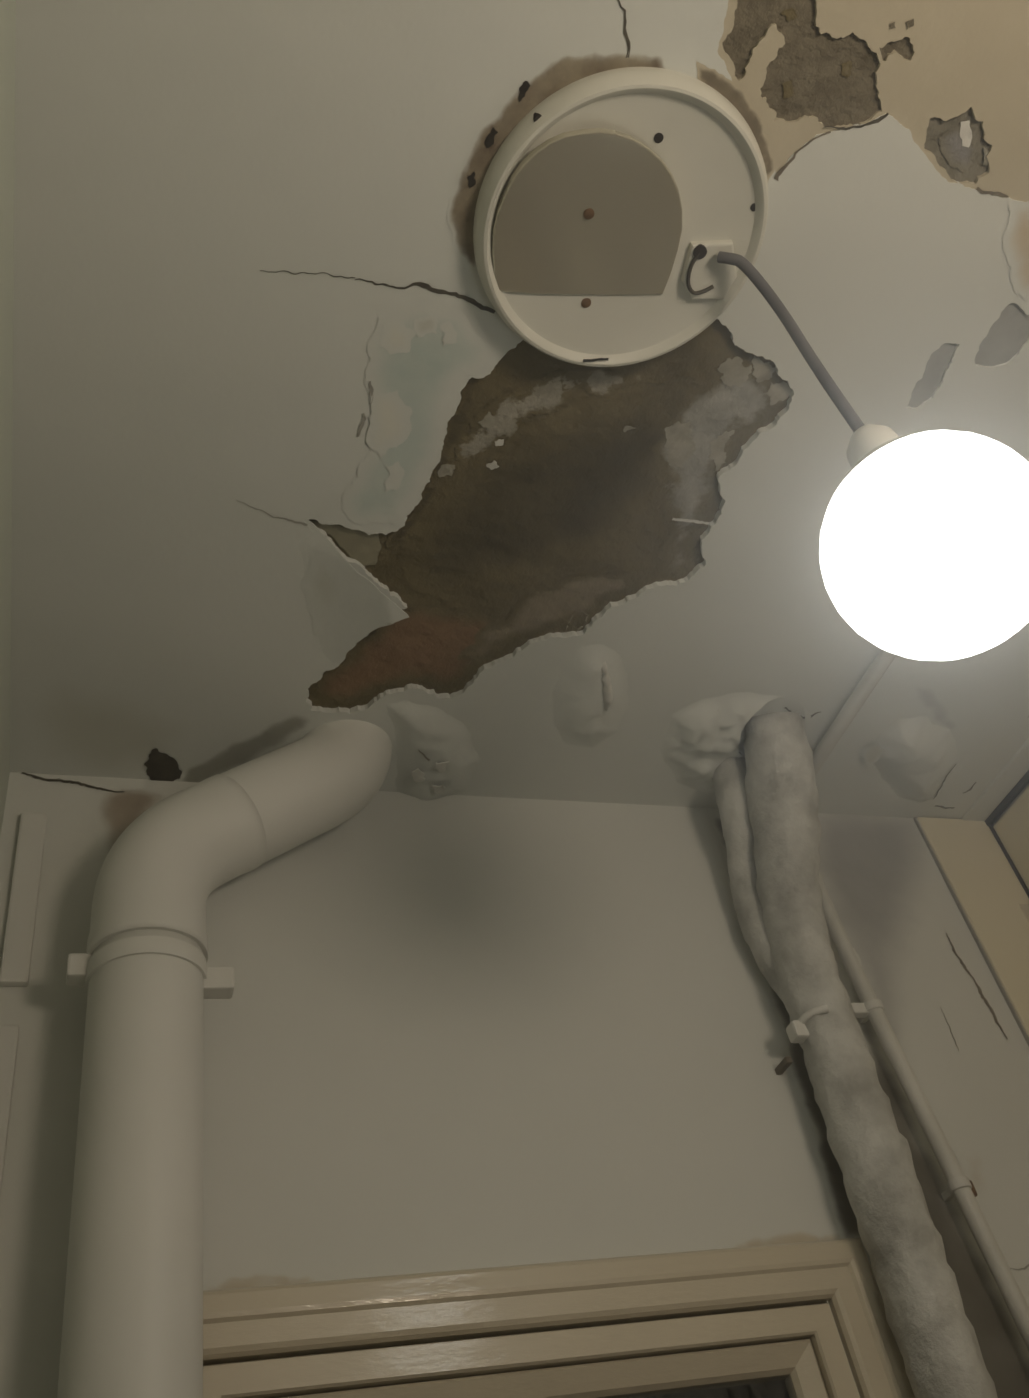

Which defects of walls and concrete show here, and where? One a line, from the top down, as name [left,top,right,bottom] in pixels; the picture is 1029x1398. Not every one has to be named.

crack [618,0,631,58]
peeling [696,0,1029,202]
crack [260,270,495,314]
flaking render [975,303,1029,366]
flaking render [907,343,957,408]
flaking render [308,319,792,709]
crack [946,933,1008,1040]